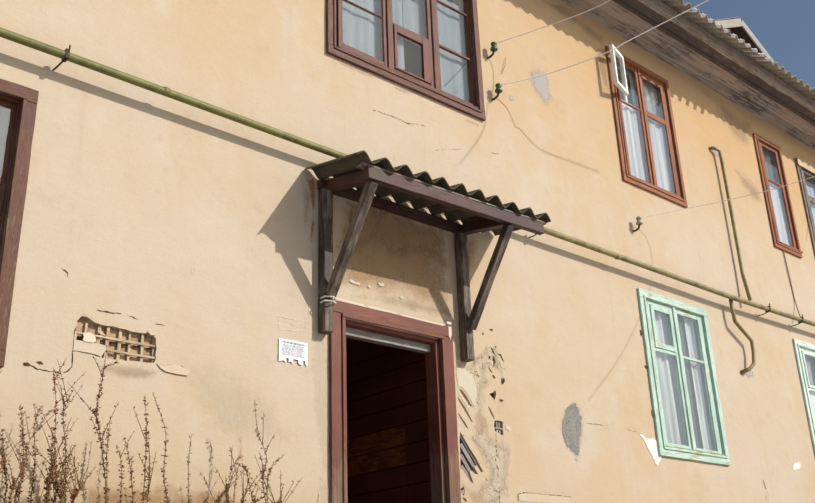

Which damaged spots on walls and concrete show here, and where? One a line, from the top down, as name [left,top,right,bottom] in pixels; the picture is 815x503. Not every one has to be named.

water stain [347,209,443,298]
spalling [73,317,191,376]
spalling [457,346,511,503]